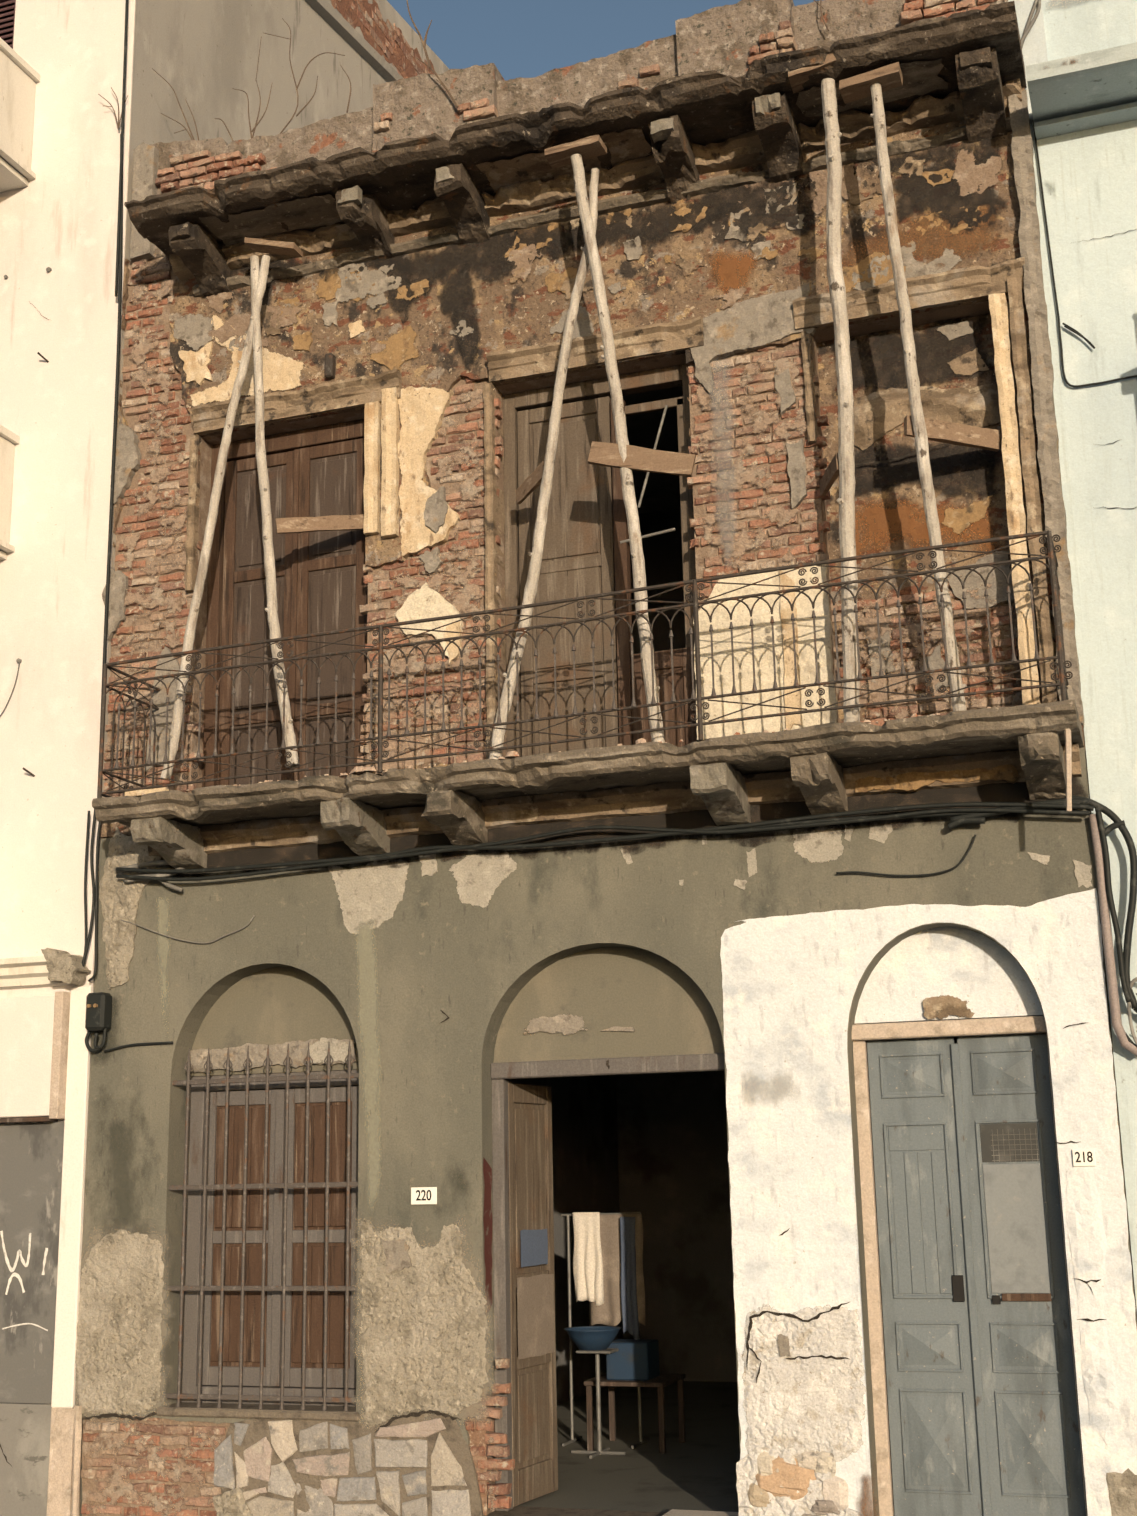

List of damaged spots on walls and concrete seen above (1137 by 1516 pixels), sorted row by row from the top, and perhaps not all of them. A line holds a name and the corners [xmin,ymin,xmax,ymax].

damp [376,257,417,323]
flaking render [842,149,1002,293]
flaking render [102,251,429,797]
flaking render [354,378,504,775]
flaking render [687,283,1019,742]
flaking render [41,827,161,990]
peeling [327,851,517,935]
peeling [793,824,893,863]
flaking render [75,1227,253,1516]
flaking render [355,1158,515,1515]
flaking render [741,1304,866,1462]
flaking render [1106,1468,1137,1516]